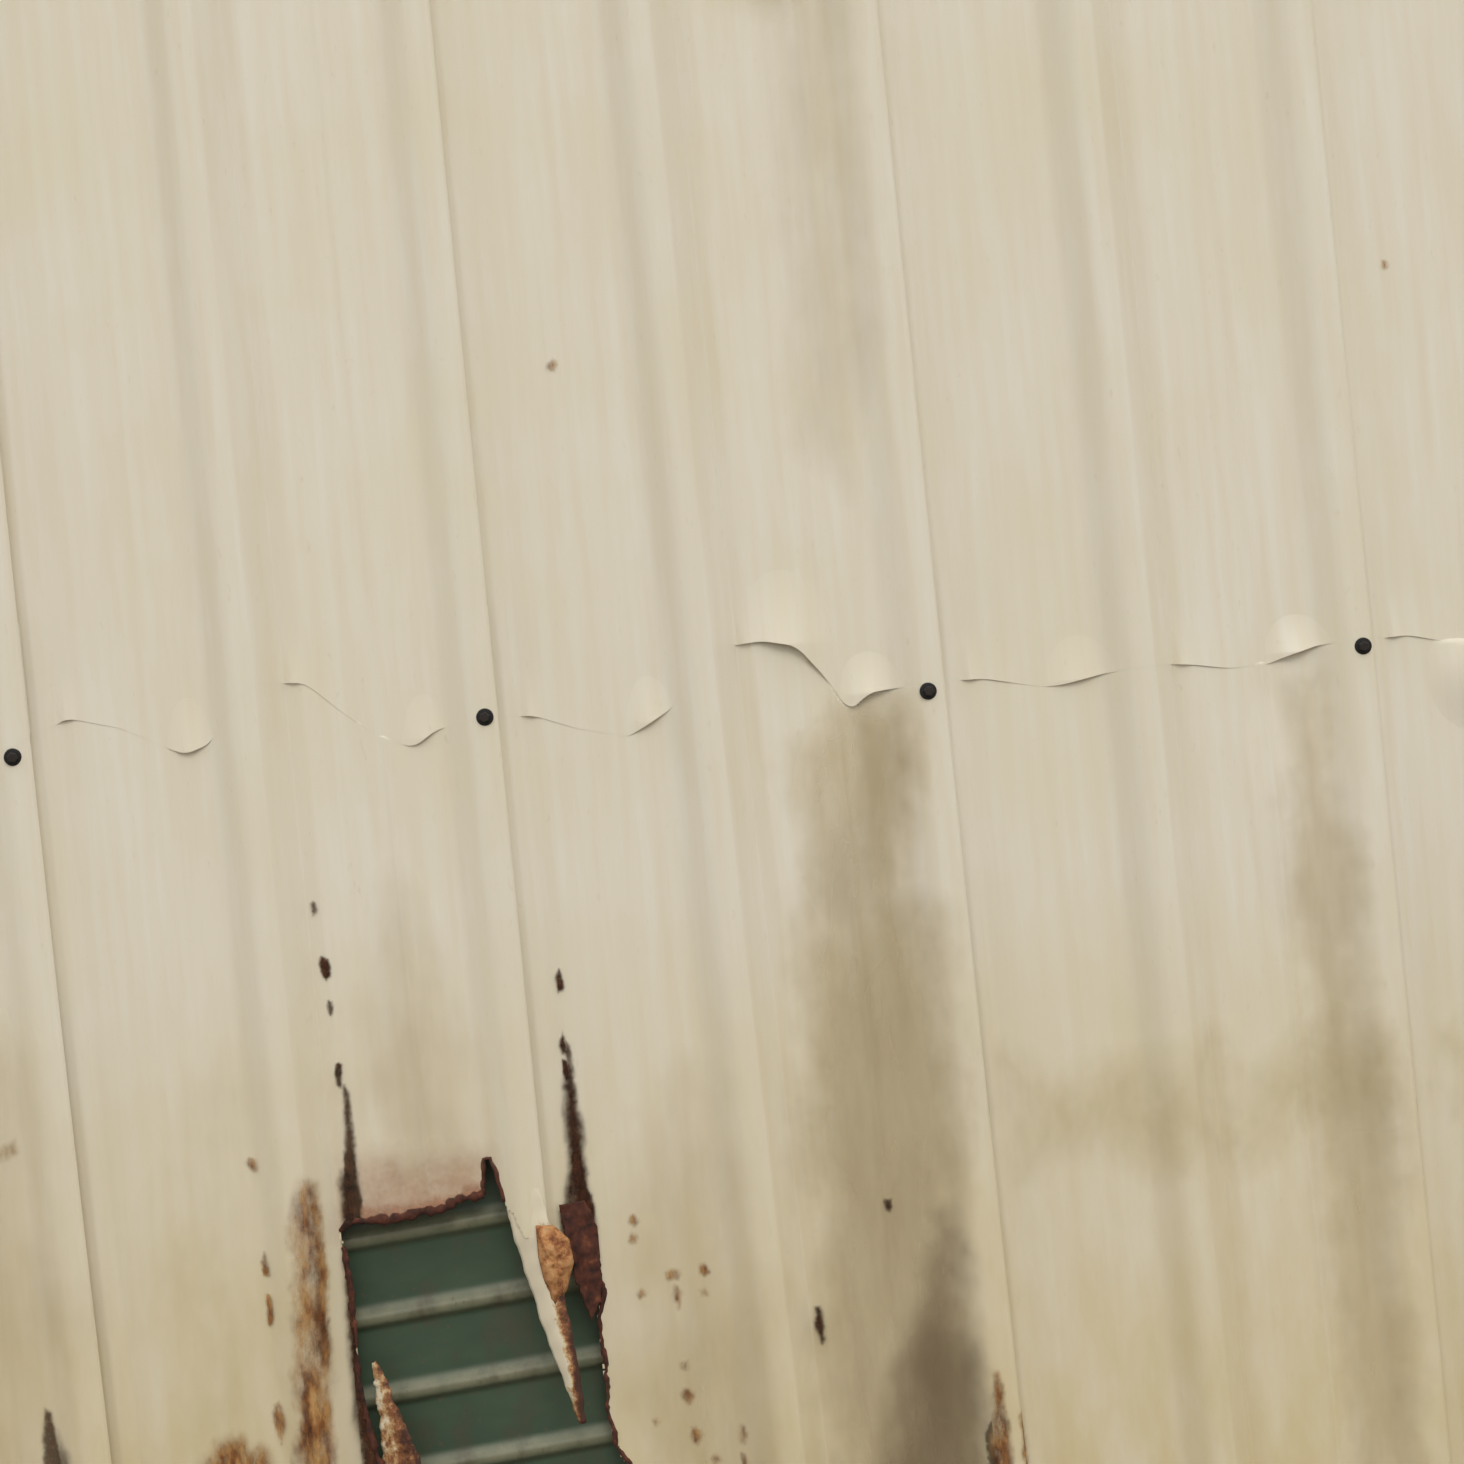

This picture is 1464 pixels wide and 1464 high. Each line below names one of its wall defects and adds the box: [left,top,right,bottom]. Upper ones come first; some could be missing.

corrosion [319,956,331,979]
corrosion [556,969,564,991]
corrosion [274,1063,506,1464]
corrosion [536,1035,633,1464]
corrosion [211,1442,267,1464]
corrosion [991,1374,1028,1464]